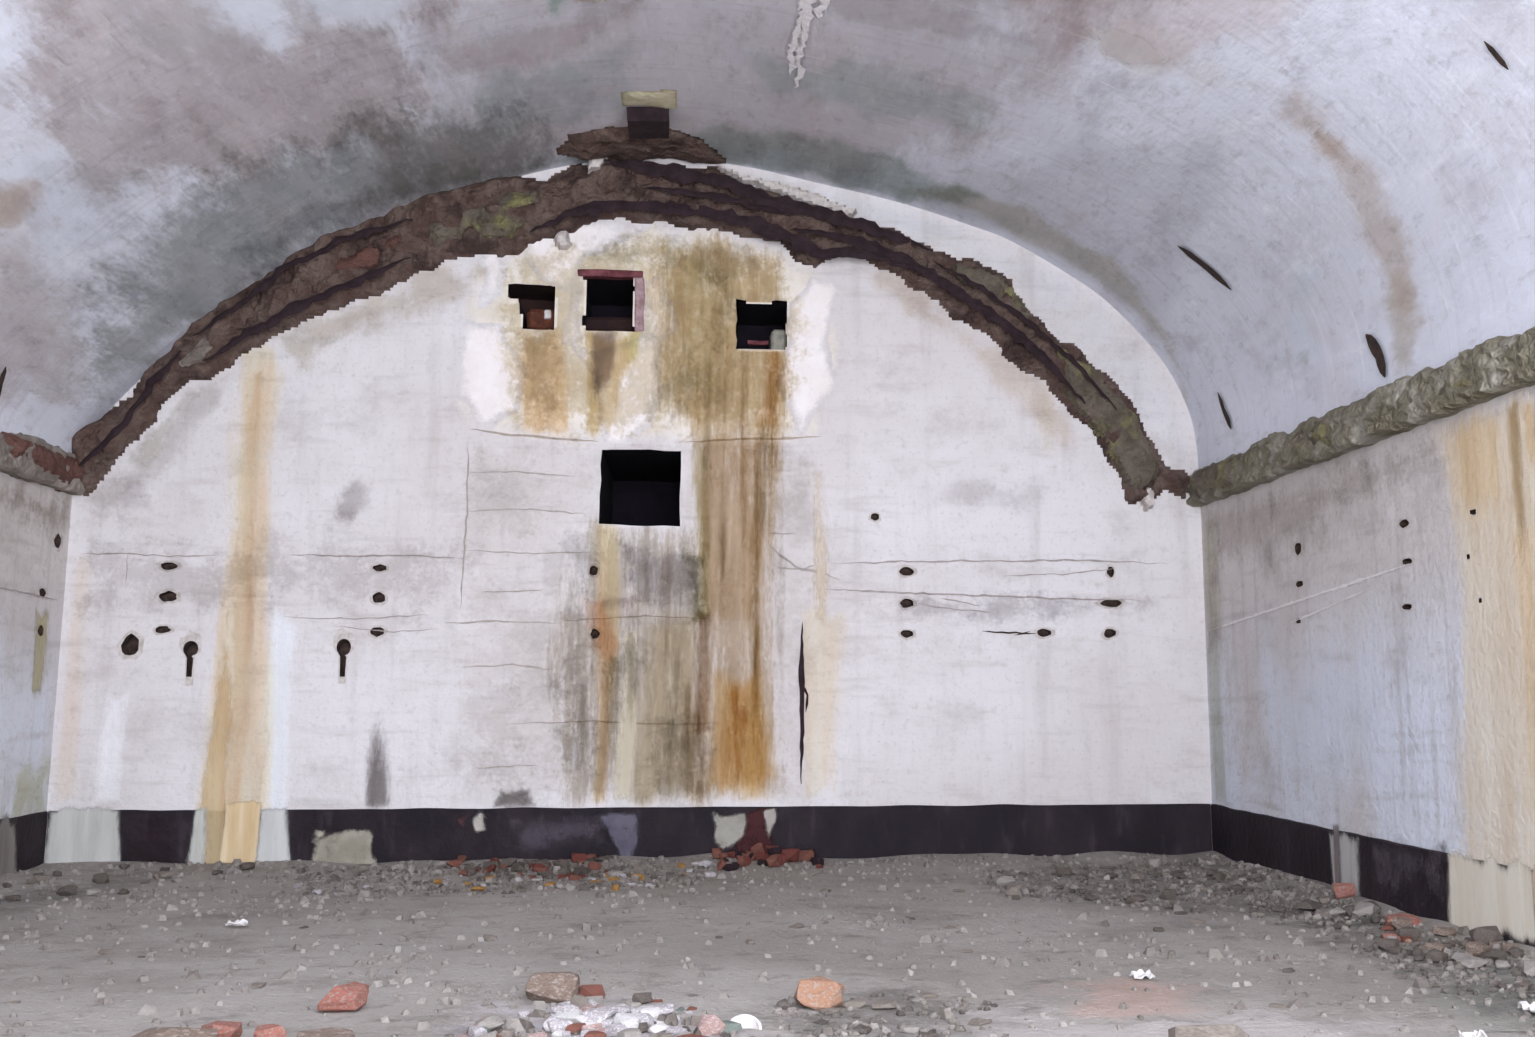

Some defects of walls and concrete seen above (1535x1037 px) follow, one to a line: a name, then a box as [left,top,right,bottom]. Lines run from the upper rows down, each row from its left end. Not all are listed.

peeling [104,0,422,73]
leakage [787,0,830,88]
spalling [0,89,1535,641]
rust [202,656,261,864]
rust [615,634,637,797]
rust [1427,386,1535,942]